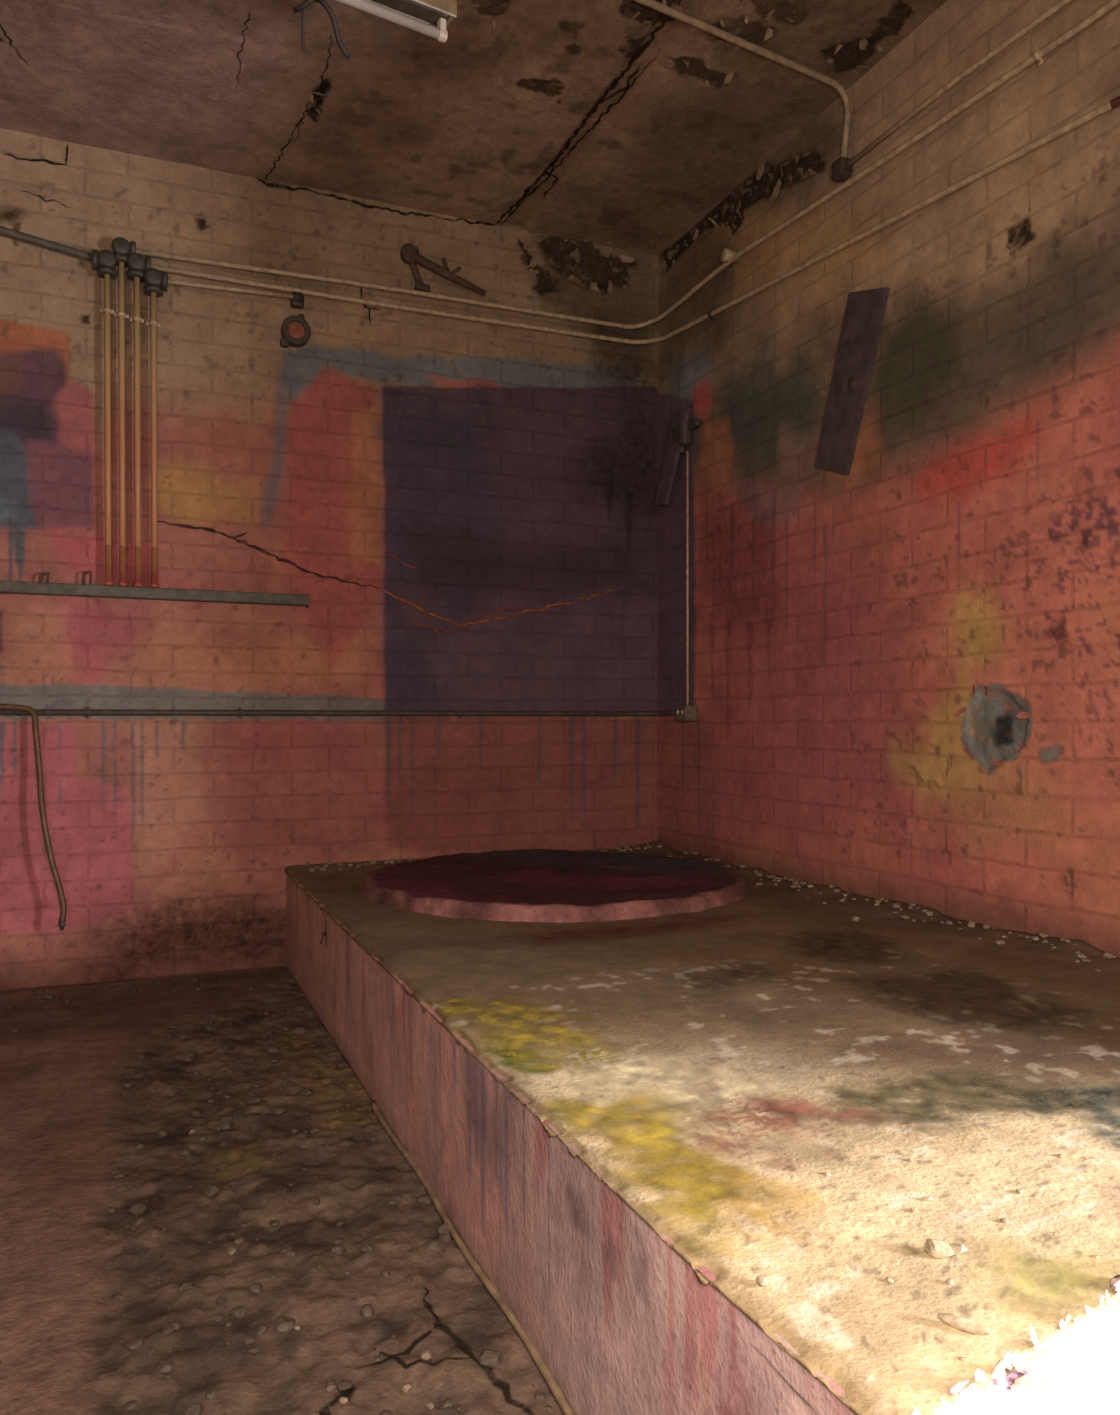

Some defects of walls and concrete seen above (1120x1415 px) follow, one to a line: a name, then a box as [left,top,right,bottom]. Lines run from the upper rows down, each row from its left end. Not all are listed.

crack [0,25,29,65]
crack [235,13,250,90]
crack [257,0,681,226]
spalling [955,684,1032,774]
crack [319,1287,532,1415]
spalling [911,1281,1120,1415]